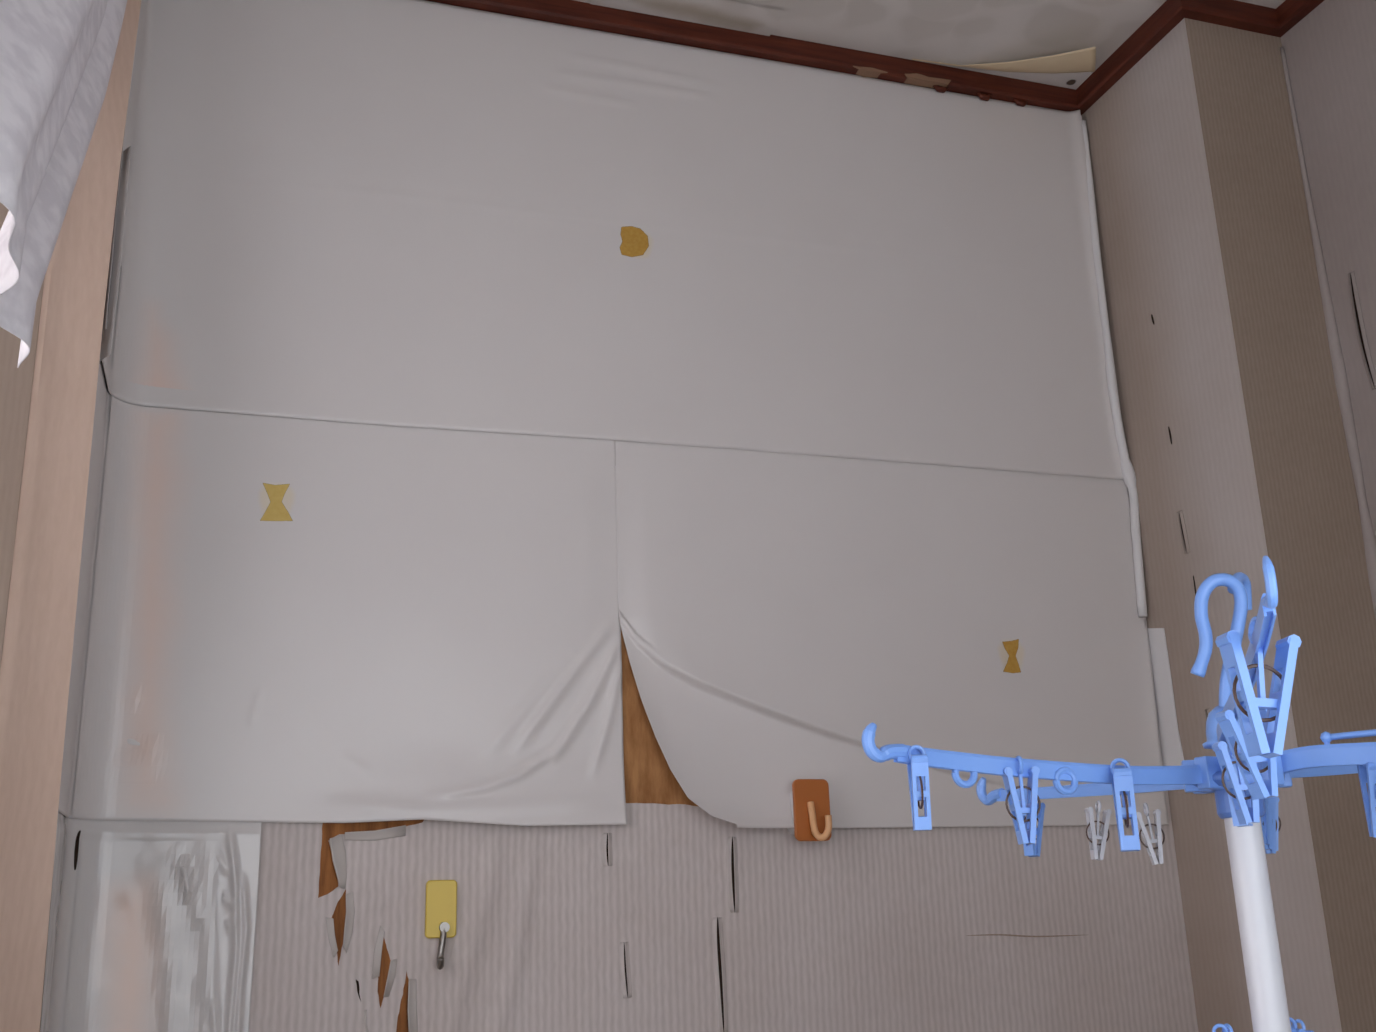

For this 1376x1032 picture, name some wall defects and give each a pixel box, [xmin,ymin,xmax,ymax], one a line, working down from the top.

peeling [620,625,699,807]
peeling [325,825,406,958]
peeling [372,926,418,1032]